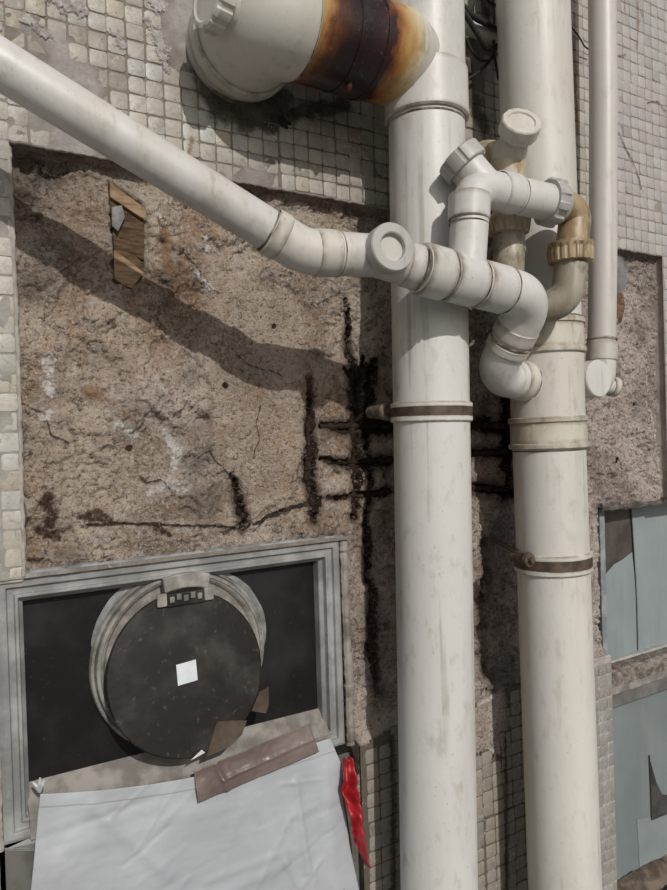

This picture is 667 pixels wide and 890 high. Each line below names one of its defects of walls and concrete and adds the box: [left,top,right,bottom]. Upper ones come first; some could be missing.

leakage [193,69,351,134]
spalling [9,144,398,806]
rust [304,374,394,514]
rust [471,484,505,492]
rust [470,421,508,430]
rust [471,447,507,457]
flaking render [468,307,521,758]
spalling [585,250,666,658]
rust [364,579,381,682]